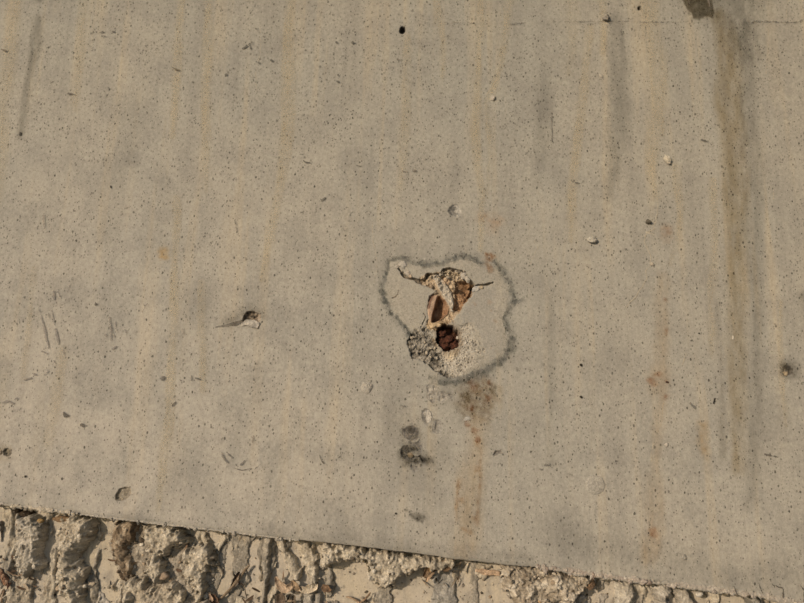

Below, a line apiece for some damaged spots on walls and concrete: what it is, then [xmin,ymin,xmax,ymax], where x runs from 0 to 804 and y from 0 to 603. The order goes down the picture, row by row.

spalling [381,257,511,381]
spalling [398,406,445,475]
peeling [113,484,134,504]
spalling [0,502,299,542]
spalling [535,563,804,603]